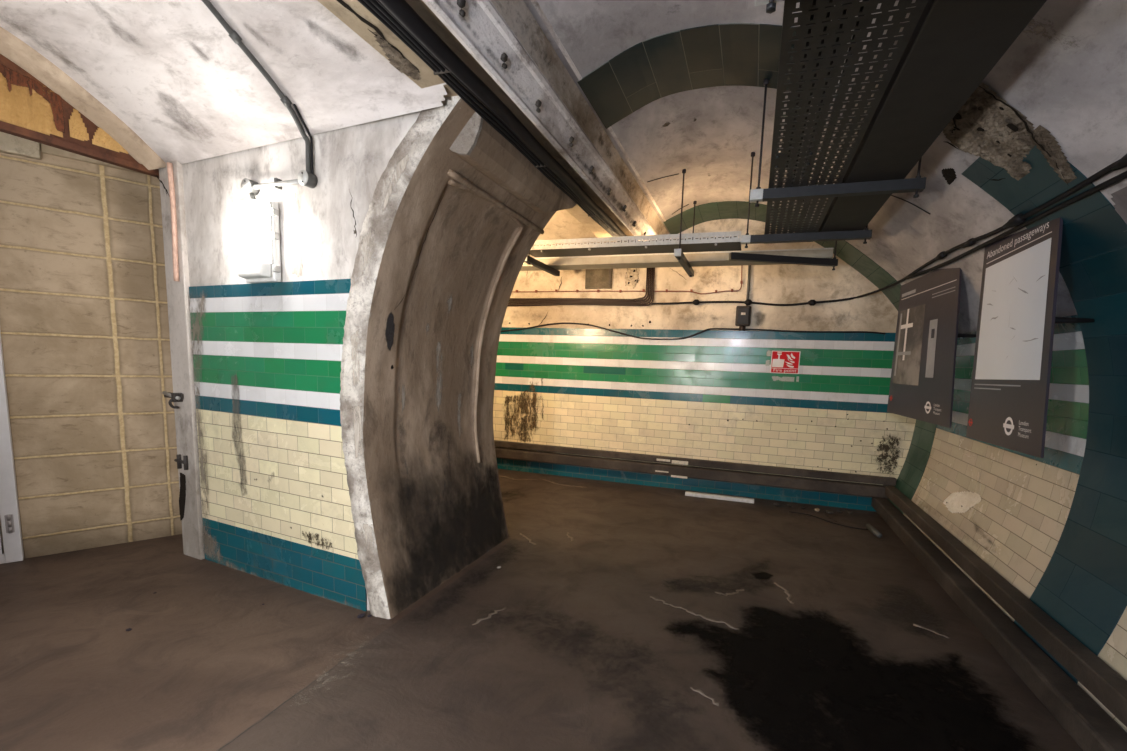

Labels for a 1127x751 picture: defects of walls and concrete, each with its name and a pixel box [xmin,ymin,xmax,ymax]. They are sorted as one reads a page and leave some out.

flaking render [942,82,1077,186]
leakage [232,376,246,494]
leakage [504,378,544,442]
leakage [873,435,901,474]
leakage [394,461,524,614]
leakage [666,606,1034,751]